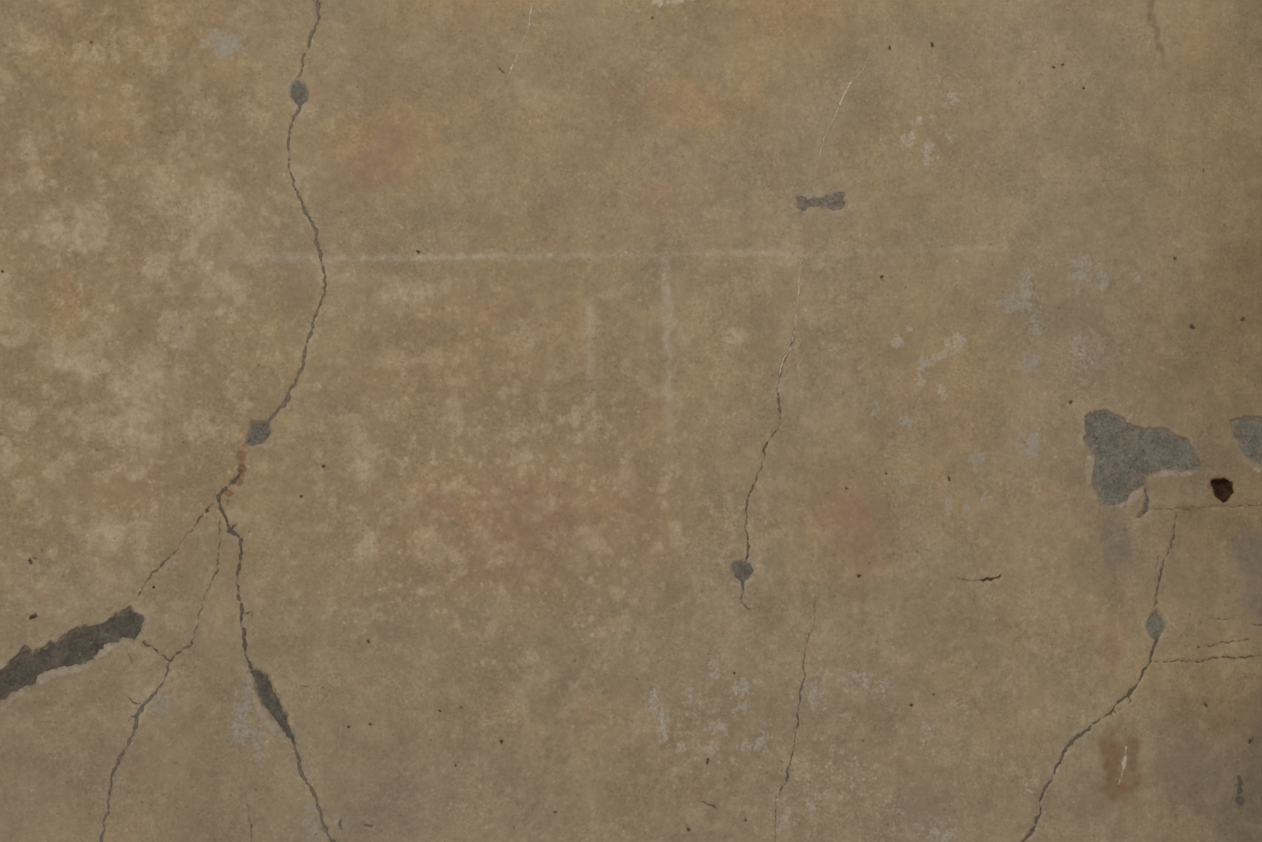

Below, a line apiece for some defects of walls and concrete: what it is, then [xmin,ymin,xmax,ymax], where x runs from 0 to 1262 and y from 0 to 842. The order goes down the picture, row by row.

crack [301,0,321,73]
spalling [789,192,846,214]
crack [268,107,327,421]
crack [740,343,792,609]
spalling [1083,410,1199,518]
rust [1205,473,1235,504]
spalling [1231,417,1262,474]
crack [138,470,252,667]
spalling [0,607,145,715]
crack [100,609,202,842]
crack [1021,618,1262,842]
crack [293,743,373,842]